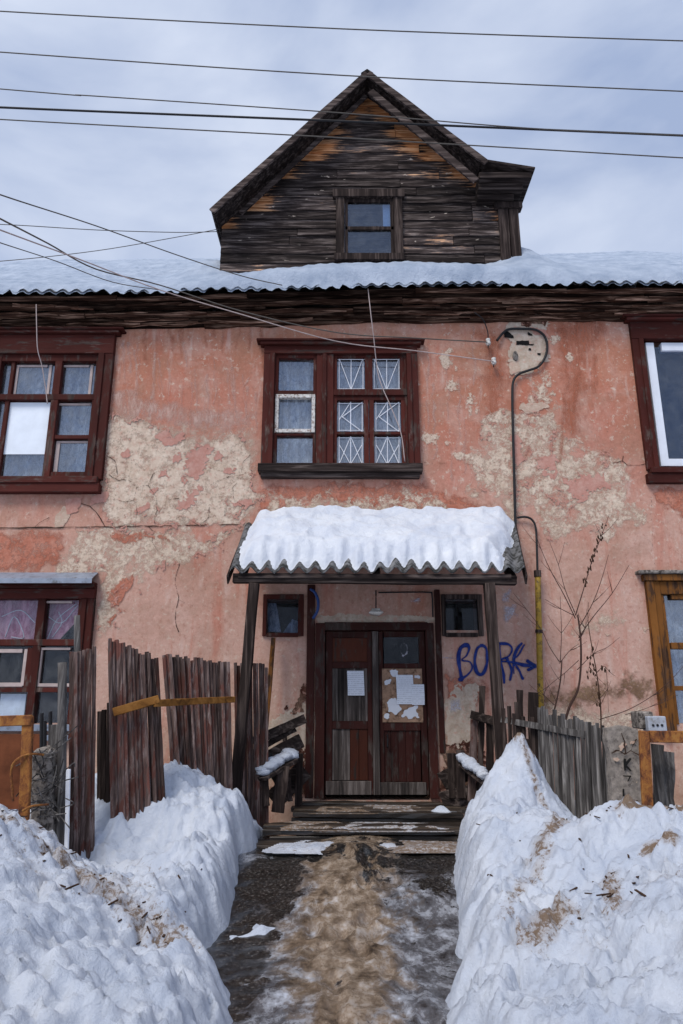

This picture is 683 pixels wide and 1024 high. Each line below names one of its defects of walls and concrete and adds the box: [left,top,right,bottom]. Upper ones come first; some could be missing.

crack [0,455,249,551]
peeling [0,314,646,637]
flaking render [438,674,488,791]